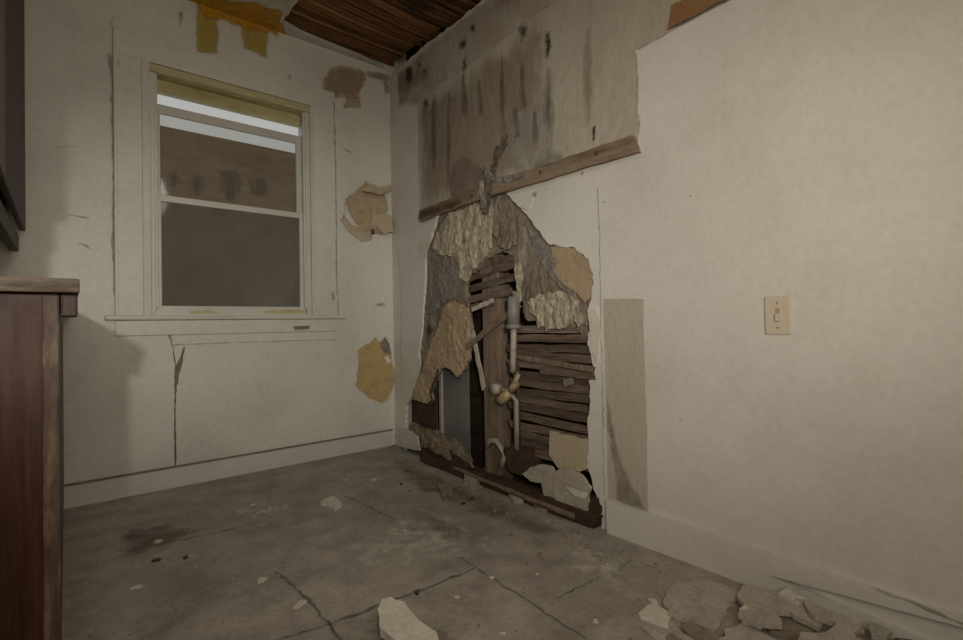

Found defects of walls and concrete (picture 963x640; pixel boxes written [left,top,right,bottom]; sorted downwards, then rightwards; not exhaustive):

flaking render [279,0,482,66]
peeling [322,65,366,109]
water stain [370,0,559,197]
peeling [340,180,394,242]
flaking render [411,191,601,405]
crack [168,335,252,466]
flaking render [354,337,395,406]
crack [283,568,497,637]